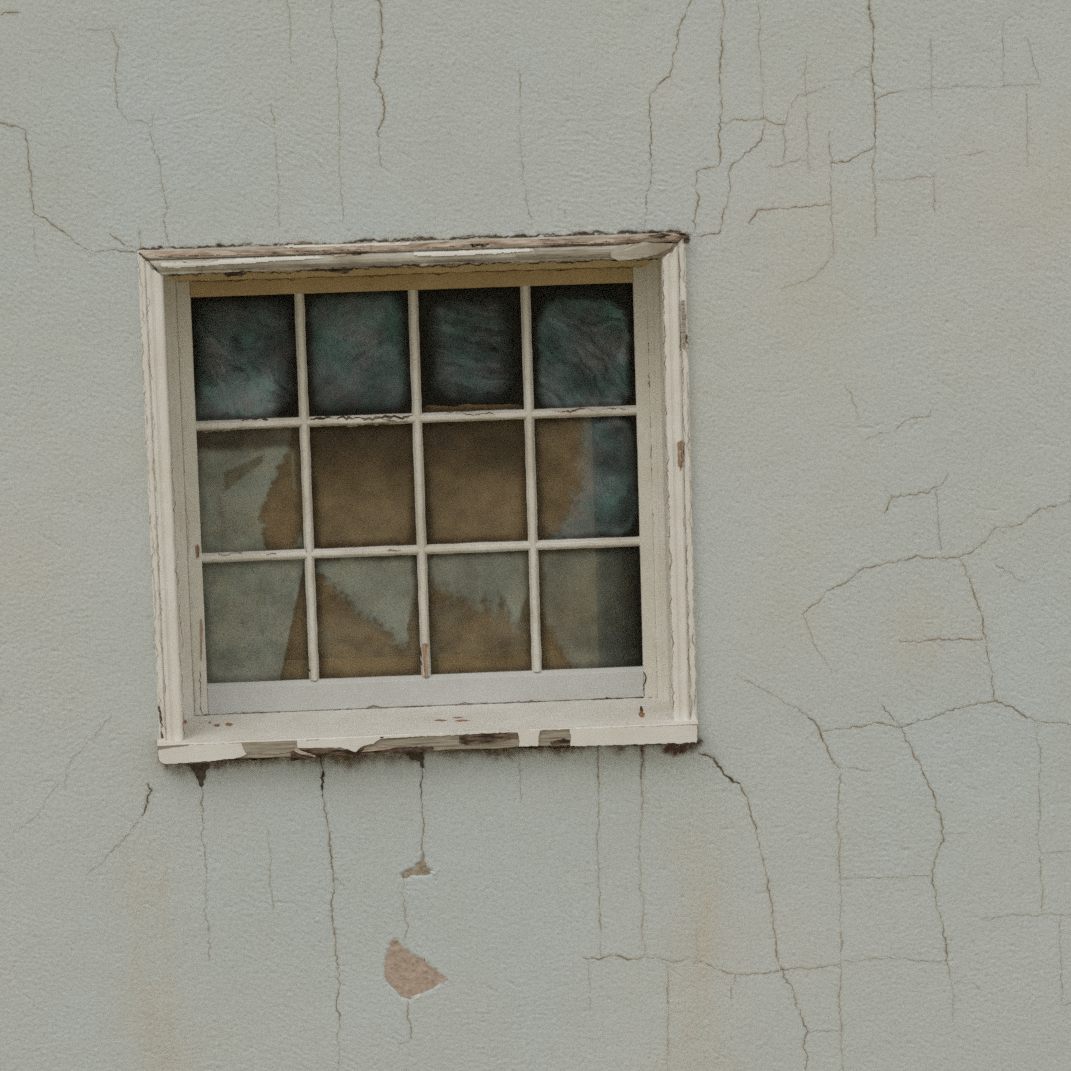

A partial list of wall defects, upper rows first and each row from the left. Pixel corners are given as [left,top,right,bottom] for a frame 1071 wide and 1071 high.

crack [0,118,168,261]
crack [374,0,386,163]
crack [644,0,691,227]
crack [693,0,1042,288]
crack [320,757,344,1063]
spalling [406,752,425,768]
spalling [384,937,448,999]
spalling [401,855,440,878]
crack [418,767,426,851]
peeling [297,725,697,752]
crack [582,474,1071,1071]